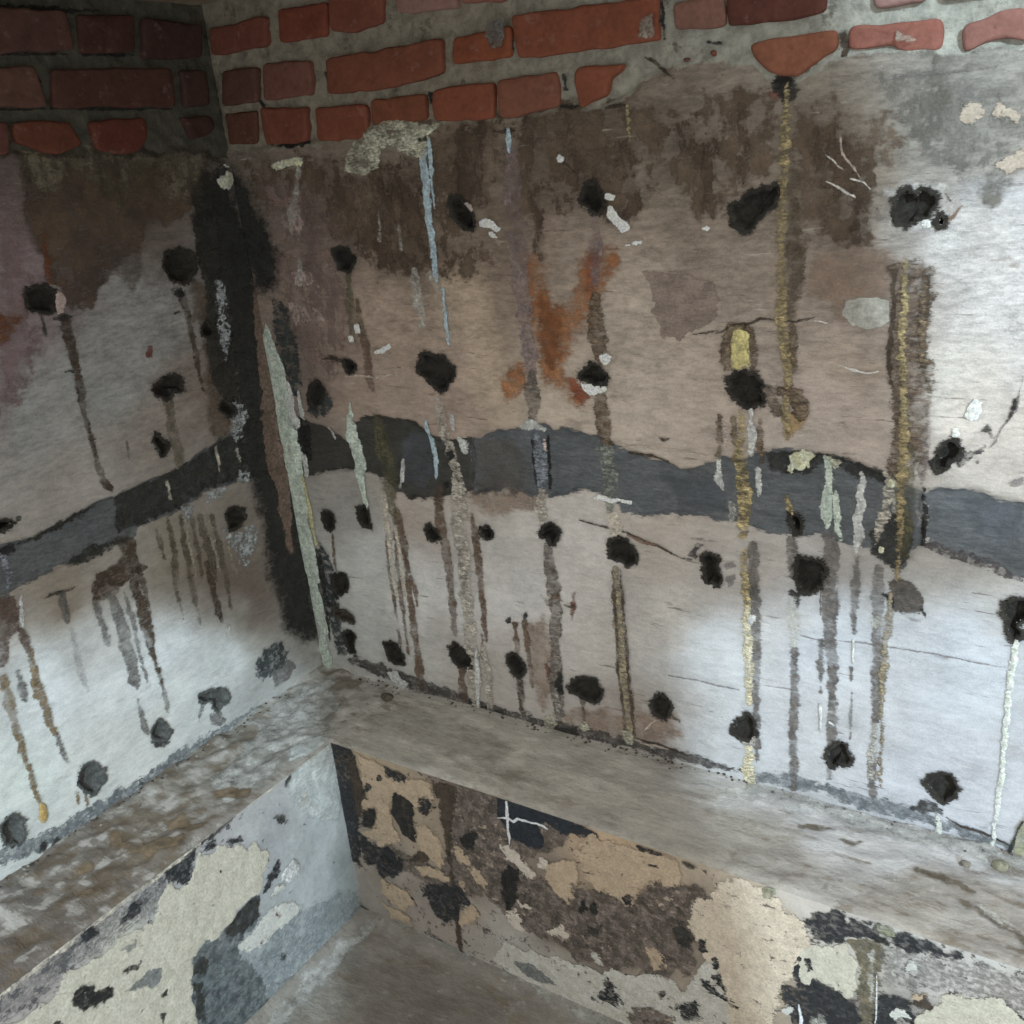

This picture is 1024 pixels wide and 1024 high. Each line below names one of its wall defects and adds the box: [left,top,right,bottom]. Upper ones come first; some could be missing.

rust [501,363,525,398]
rust [526,247,620,404]
water stain [0,50,1024,866]
peeling [11,841,302,1024]
peeling [357,754,488,893]
peeling [458,905,480,928]
peeling [499,832,695,908]
peeling [493,877,858,1024]
peeling [889,993,1024,1024]
water stain [914,867,1024,943]